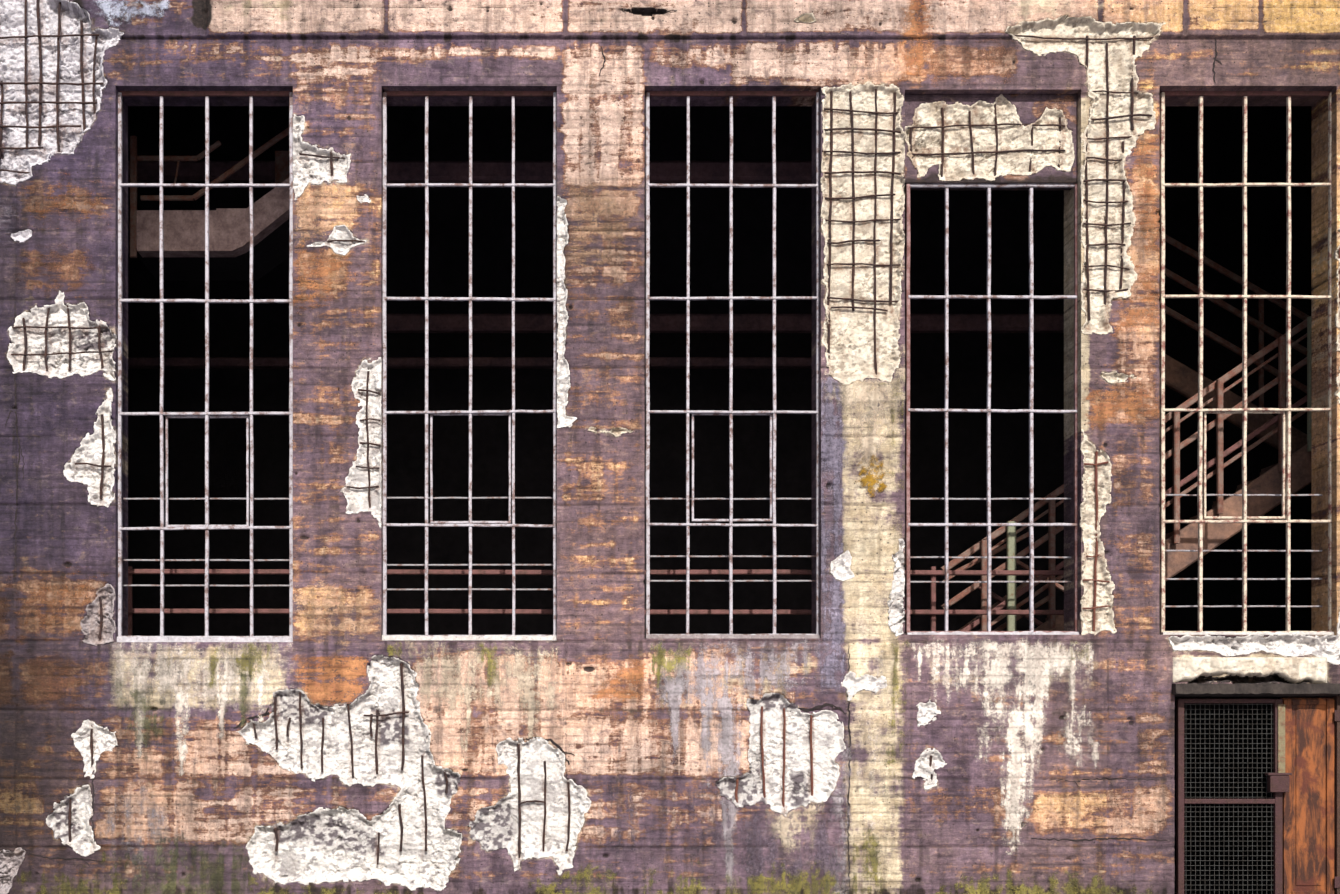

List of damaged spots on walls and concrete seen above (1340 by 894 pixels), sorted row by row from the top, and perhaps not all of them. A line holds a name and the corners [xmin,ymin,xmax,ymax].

spalling [0,0,170,186]
spalling [0,207,33,243]
spalling [820,15,1166,385]
spalling [7,291,117,508]
spalling [340,357,382,528]
spalling [0,847,26,894]
spalling [46,720,118,857]
leakage [115,642,278,776]
spalling [236,655,591,891]
spalling [715,693,846,817]
leakage [909,640,1099,854]
spalling [1187,673,1311,684]